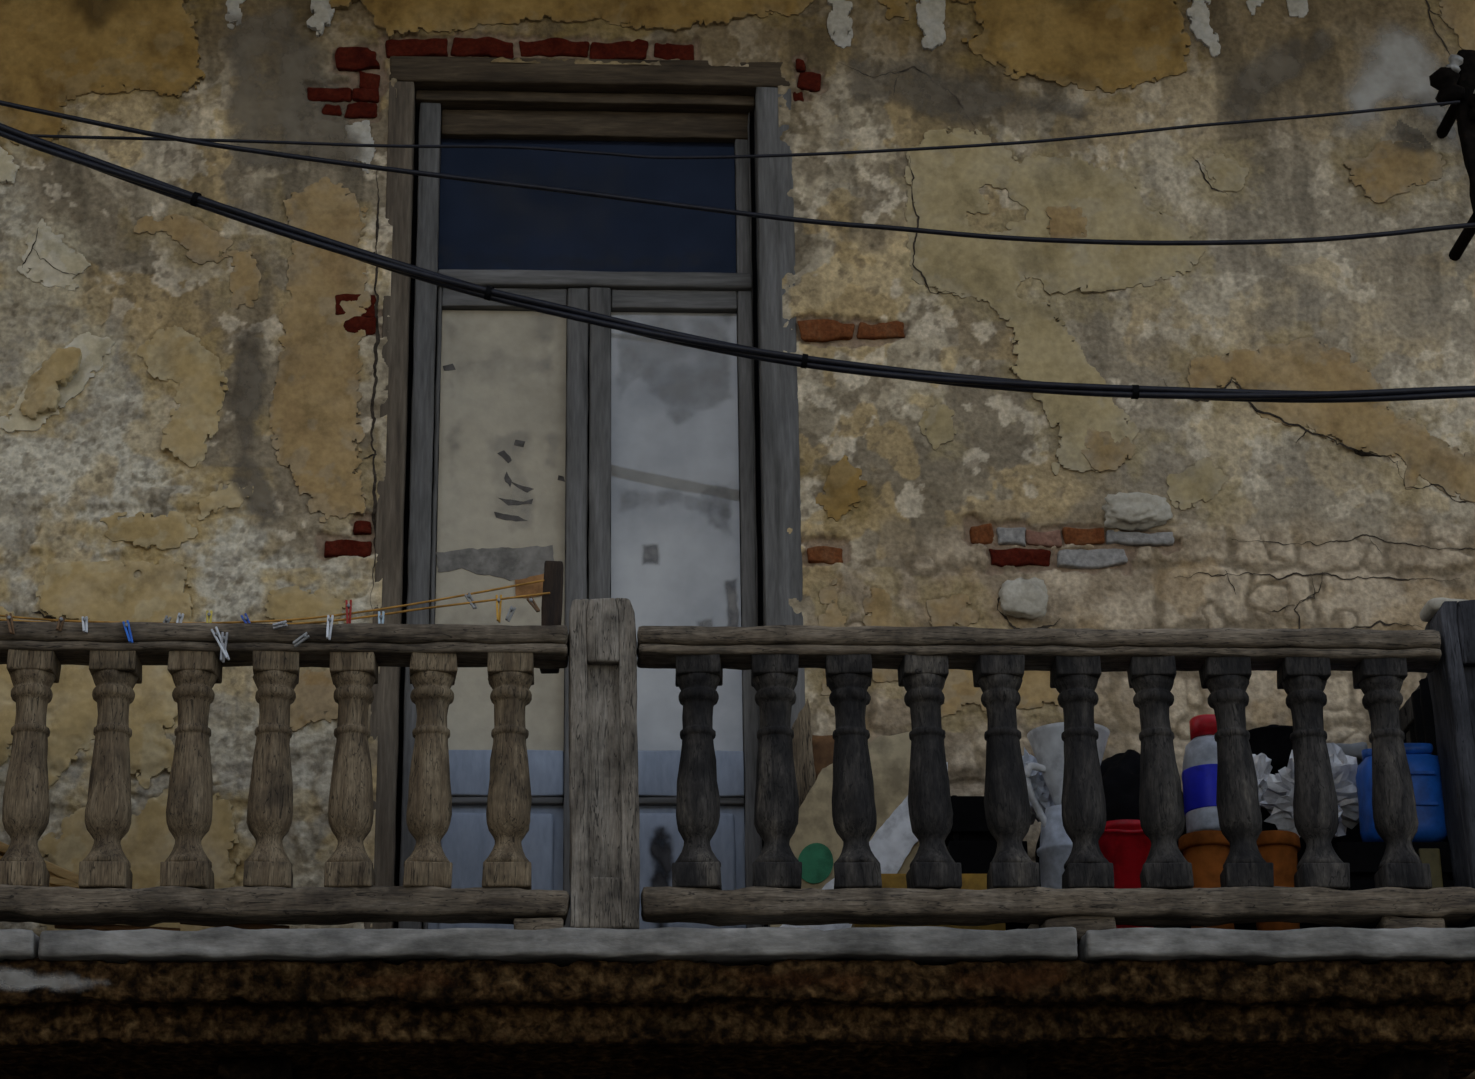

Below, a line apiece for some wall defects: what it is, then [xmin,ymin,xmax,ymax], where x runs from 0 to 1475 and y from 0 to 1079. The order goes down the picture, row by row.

flaking render [0,0,206,184]
flaking render [307,0,814,119]
flaking render [950,0,1191,94]
flaking render [269,177,376,558]
crack [1163,379,1474,504]
flaking render [36,481,254,622]
flaking render [969,523,1174,569]
crack [1175,534,1475,629]
flaking render [0,664,16,766]
flaking render [46,665,98,790]
flaking render [121,665,178,889]
flaking render [290,669,338,732]